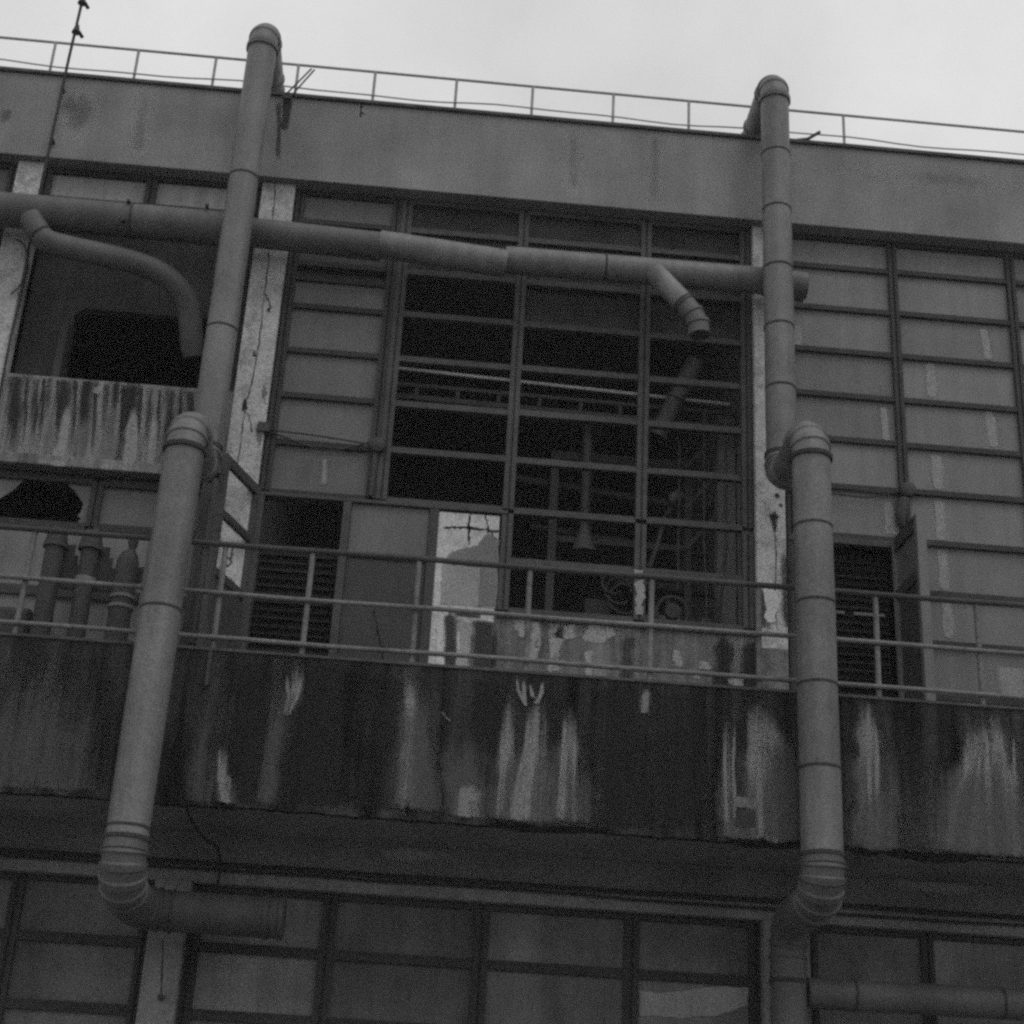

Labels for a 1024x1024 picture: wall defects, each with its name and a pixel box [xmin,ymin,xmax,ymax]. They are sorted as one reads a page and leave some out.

damp [6,377,194,466]
damp [217,612,700,829]
damp [713,639,756,687]
damp [720,717,797,843]
peeling [763,589,781,623]
efflorescence [852,709,899,850]
efflorescence [938,724,1024,855]